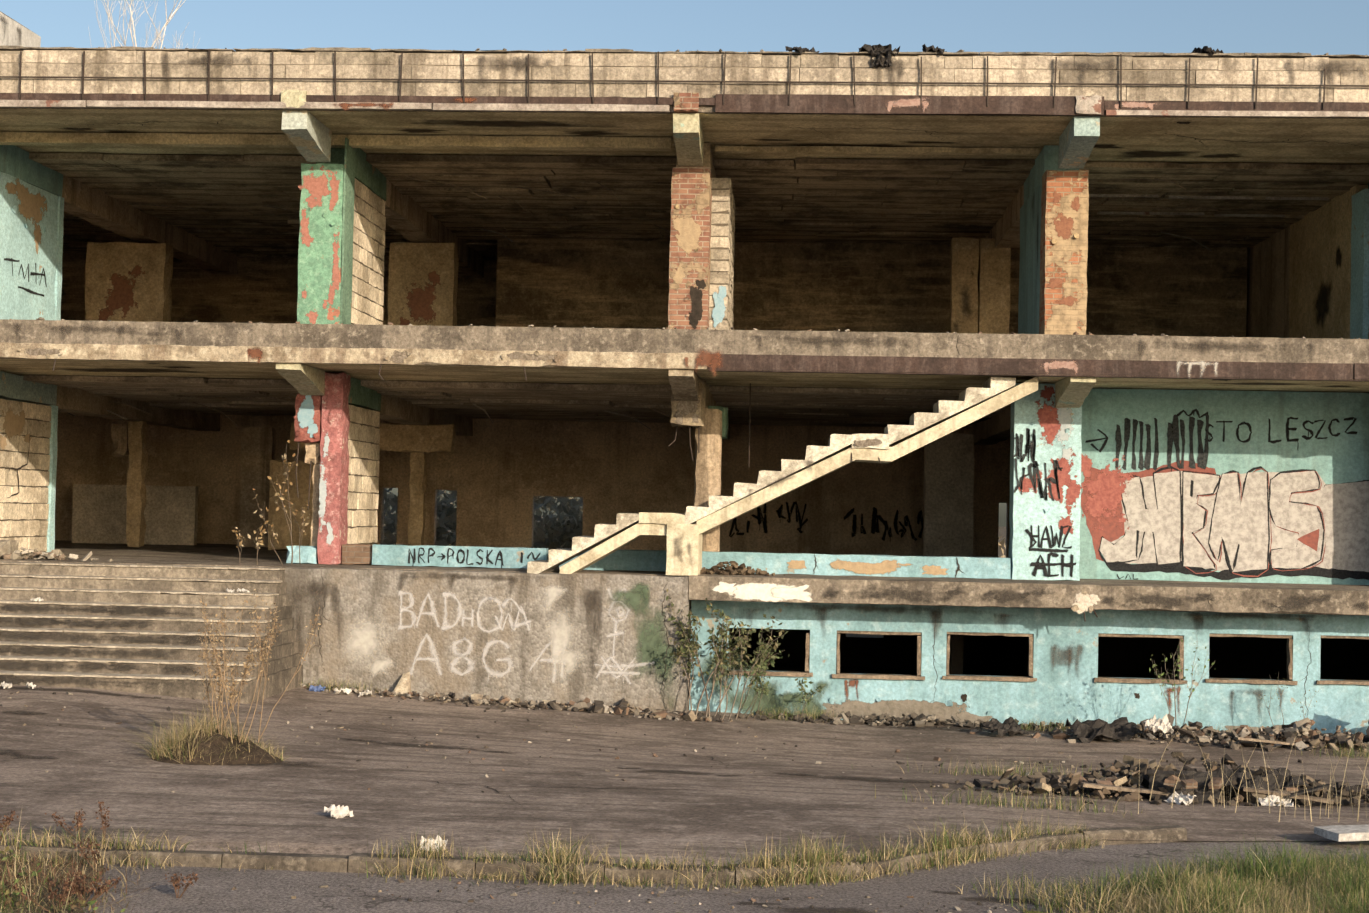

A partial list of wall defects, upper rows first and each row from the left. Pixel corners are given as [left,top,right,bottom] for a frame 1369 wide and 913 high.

peeling [5,179,47,254]
peeling [1051,191,1080,244]
peeling [298,166,341,324]
peeling [672,204,727,329]
peeling [1048,278,1079,306]
peeling [294,395,334,544]
peeling [1018,386,1135,535]
peeling [712,560,812,602]
damp [813,591,838,621]
peeling [830,560,948,575]
damp [857,588,962,632]
damp [1053,646,1082,665]